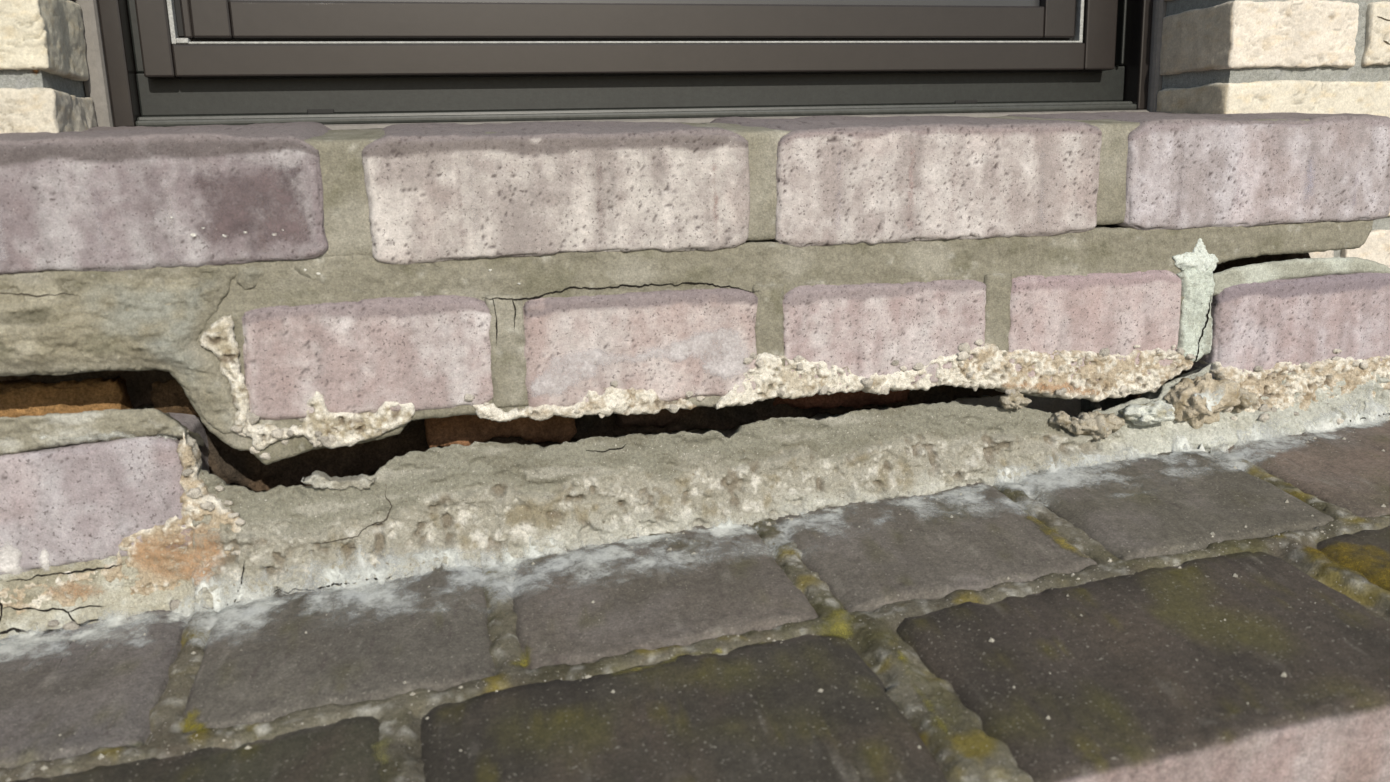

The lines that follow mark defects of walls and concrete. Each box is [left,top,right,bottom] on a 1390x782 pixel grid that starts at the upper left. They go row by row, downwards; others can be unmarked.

spalling [200,314,415,460]
crack [483,282,762,346]
spalling [464,339,1390,423]
damp [871,388,1389,522]
crack [0,564,121,668]
spalling [0,429,246,630]
damp [0,508,849,662]